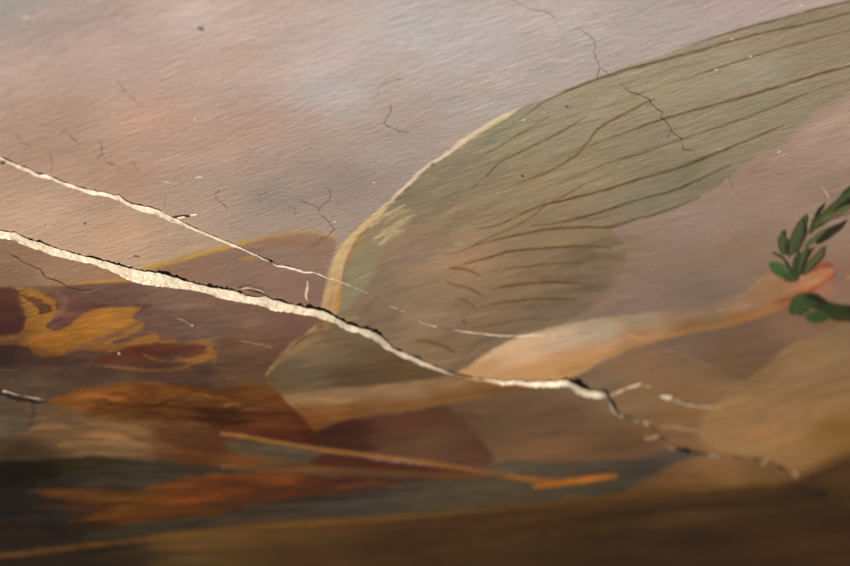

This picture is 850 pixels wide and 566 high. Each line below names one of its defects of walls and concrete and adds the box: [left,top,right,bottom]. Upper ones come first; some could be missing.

crack [0,156,809,486]